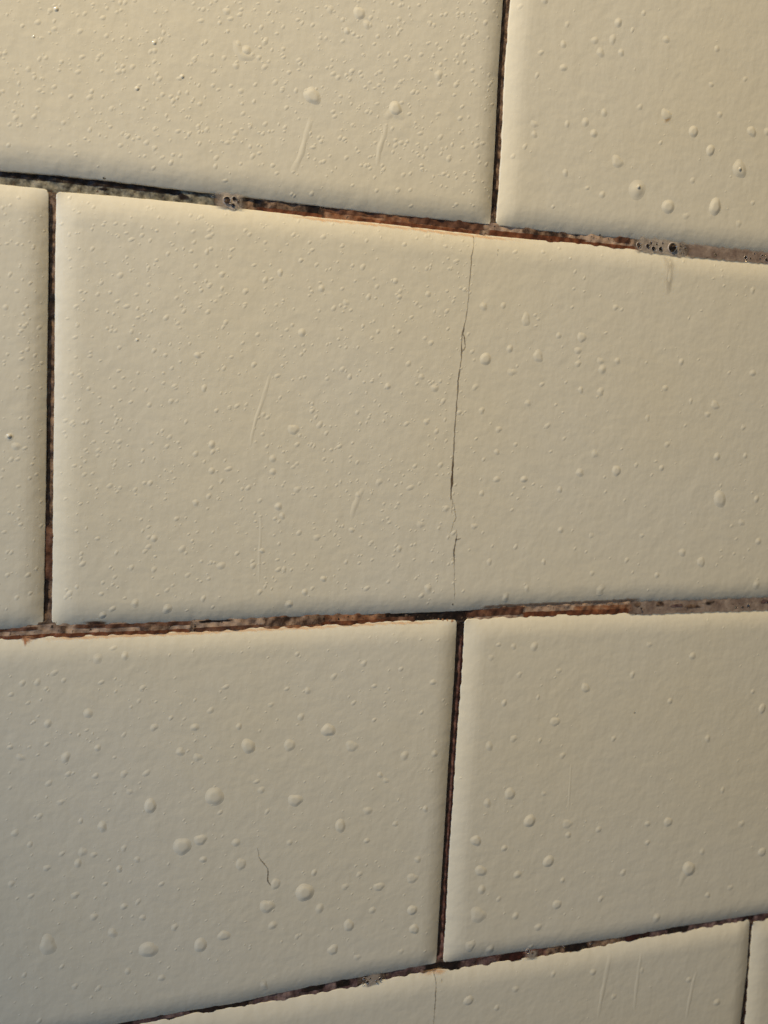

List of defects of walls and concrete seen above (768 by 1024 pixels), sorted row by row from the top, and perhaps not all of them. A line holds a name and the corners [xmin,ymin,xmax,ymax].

crack [451,328,465,491]